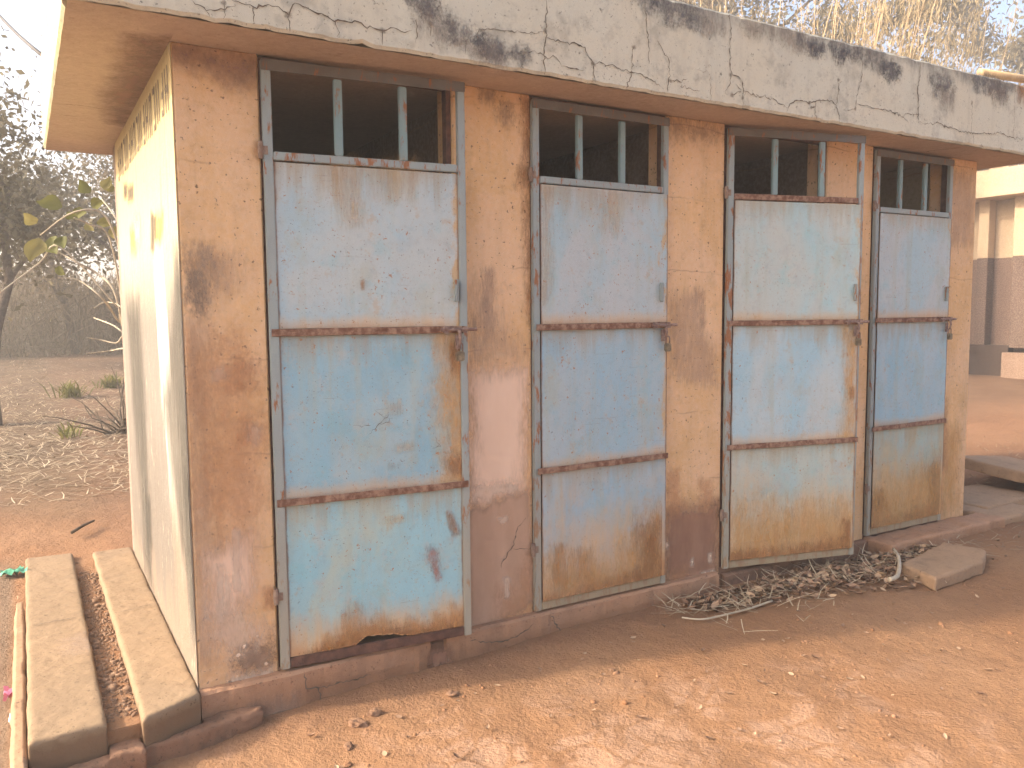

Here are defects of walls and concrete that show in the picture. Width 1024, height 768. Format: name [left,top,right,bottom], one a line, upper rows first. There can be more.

crack [192,0,441,45]
leakage [405,0,530,61]
crack [465,1,1016,144]
leakage [798,36,900,81]
leakage [972,72,1008,99]
leakage [165,262,253,622]